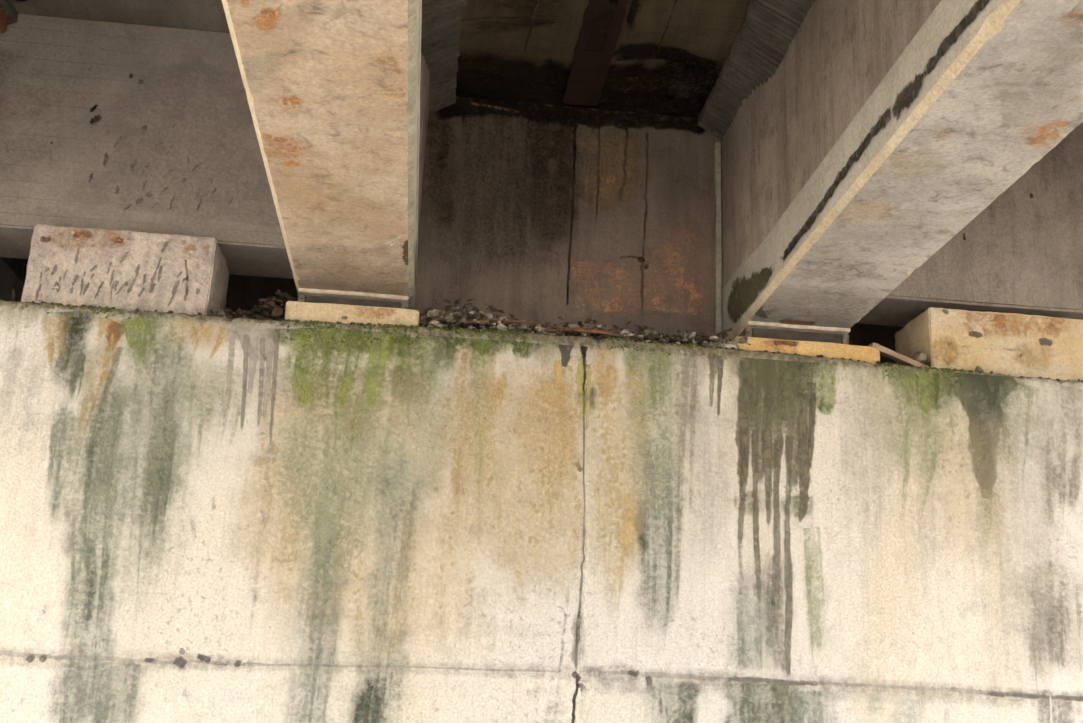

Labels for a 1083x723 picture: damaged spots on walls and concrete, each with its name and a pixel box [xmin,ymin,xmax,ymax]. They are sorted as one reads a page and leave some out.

damp [416,43,722,262]
crack [566,125,649,311]
damp [48,408,74,510]
damp [56,311,90,394]
damp [64,316,196,723]
damp [198,321,539,723]
crack [561,346,594,723]
damp [627,350,697,602]
damp [708,355,723,415]
damp [726,357,836,723]
damp [888,368,1032,503]
damp [1032,582,1066,665]